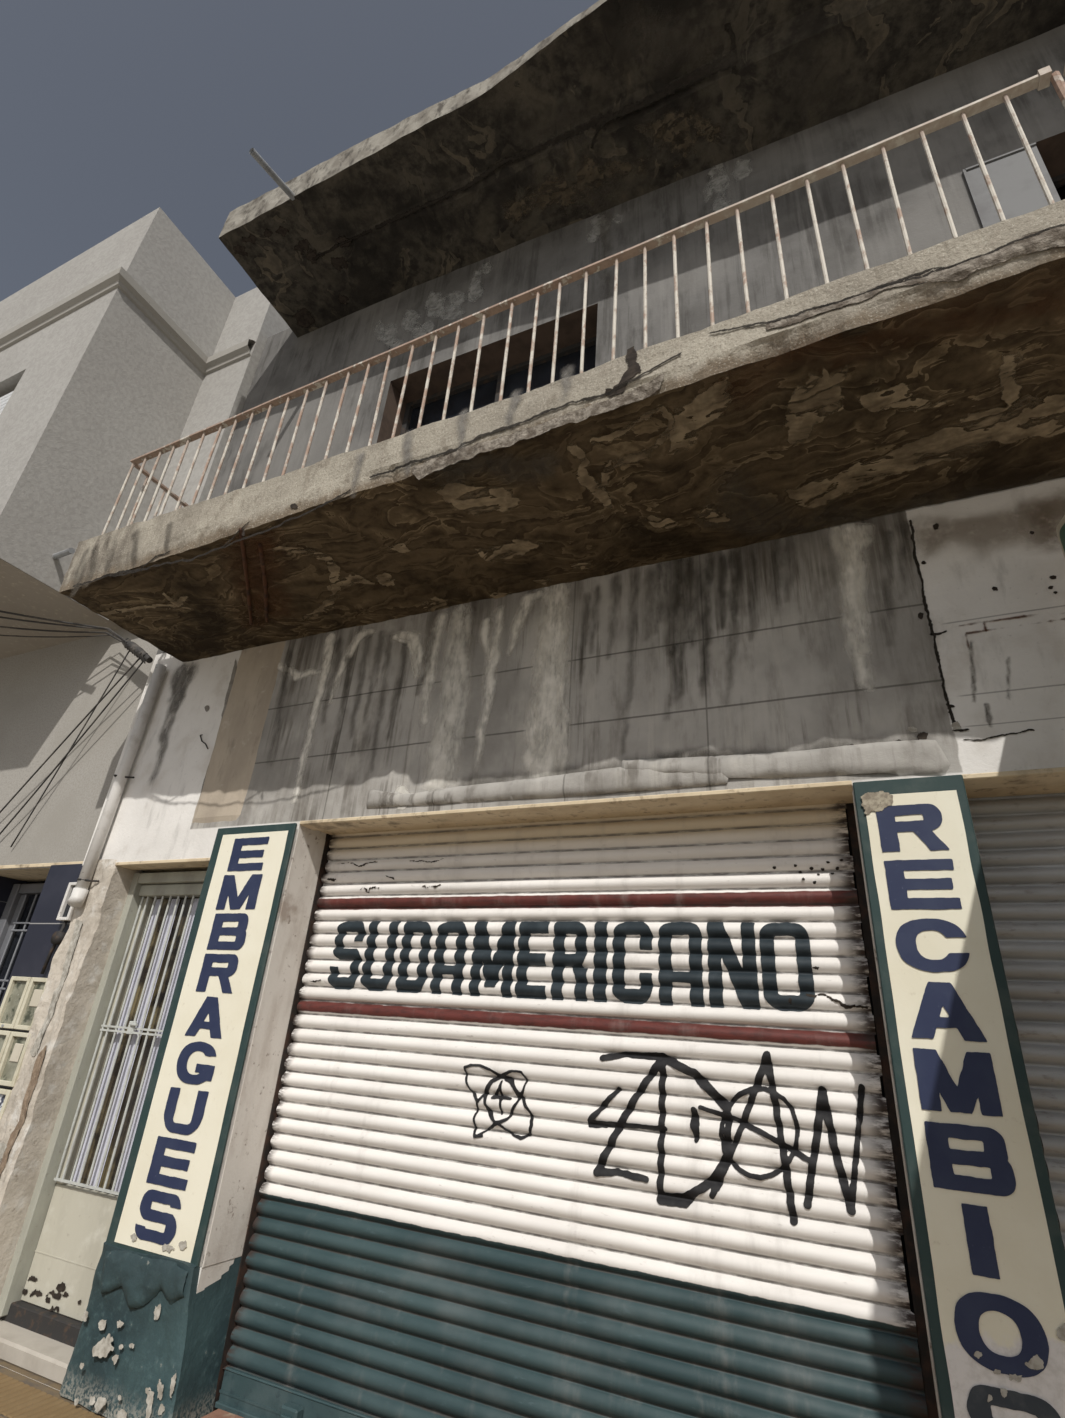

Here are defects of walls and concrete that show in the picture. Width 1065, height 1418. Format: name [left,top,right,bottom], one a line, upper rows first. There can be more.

crack [710,224,1065,334]
crack [73,352,682,587]
leakage [152,665,195,779]
leakage [278,630,374,802]
leakage [392,583,569,790]
leakage [831,524,871,689]
crack [909,520,1035,741]
peeling [22,1276,134,1369]
peeling [74,1395,127,1418]
peeling [145,1374,176,1418]